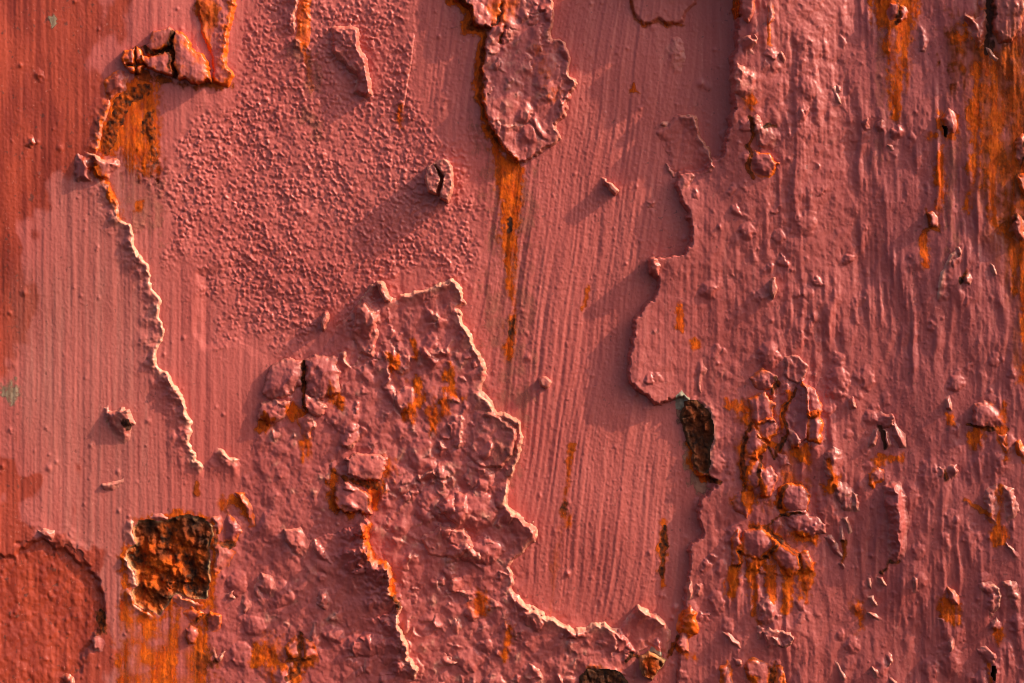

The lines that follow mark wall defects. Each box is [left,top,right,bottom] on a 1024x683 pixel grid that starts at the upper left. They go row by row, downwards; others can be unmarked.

peeling [103,26,234,100]
corrosion [867,0,921,121]
peeling [962,0,1024,61]
peeling [74,152,121,183]
corrosion [81,76,161,178]
peeling [919,108,960,268]
corrosion [937,13,1024,348]
corrosion [471,124,539,429]
peeling [126,0,910,683]
spalling [22,508,104,567]
corrosion [115,508,218,683]
peeling [976,580,1022,681]